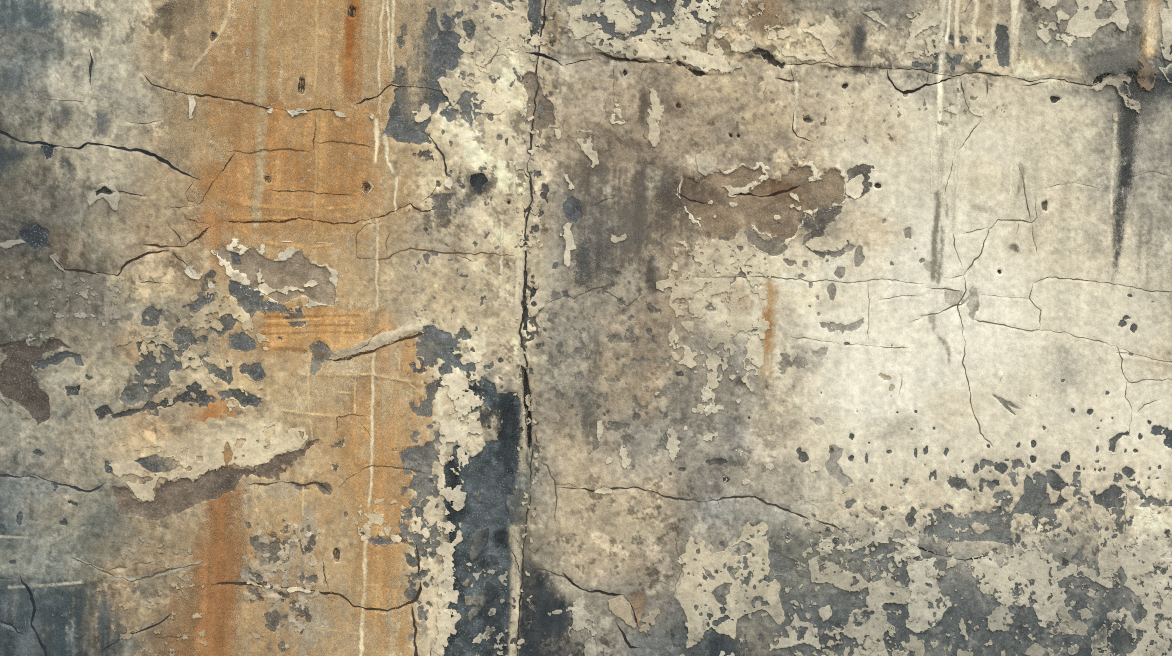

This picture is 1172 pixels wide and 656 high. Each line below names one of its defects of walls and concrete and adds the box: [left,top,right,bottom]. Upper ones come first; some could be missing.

crack [763,62,1134,191]
peeling [1036,0,1130,47]
leakage [1086,47,1172,259]
rust [1143,0,1159,57]
peeling [94,239,347,520]
rust [159,0,428,656]
crack [0,0,841,656]
leakage [444,456,461,569]
leakage [468,384,528,468]
peeling [309,0,876,656]
peeling [674,420,1172,656]
crack [696,163,1172,447]